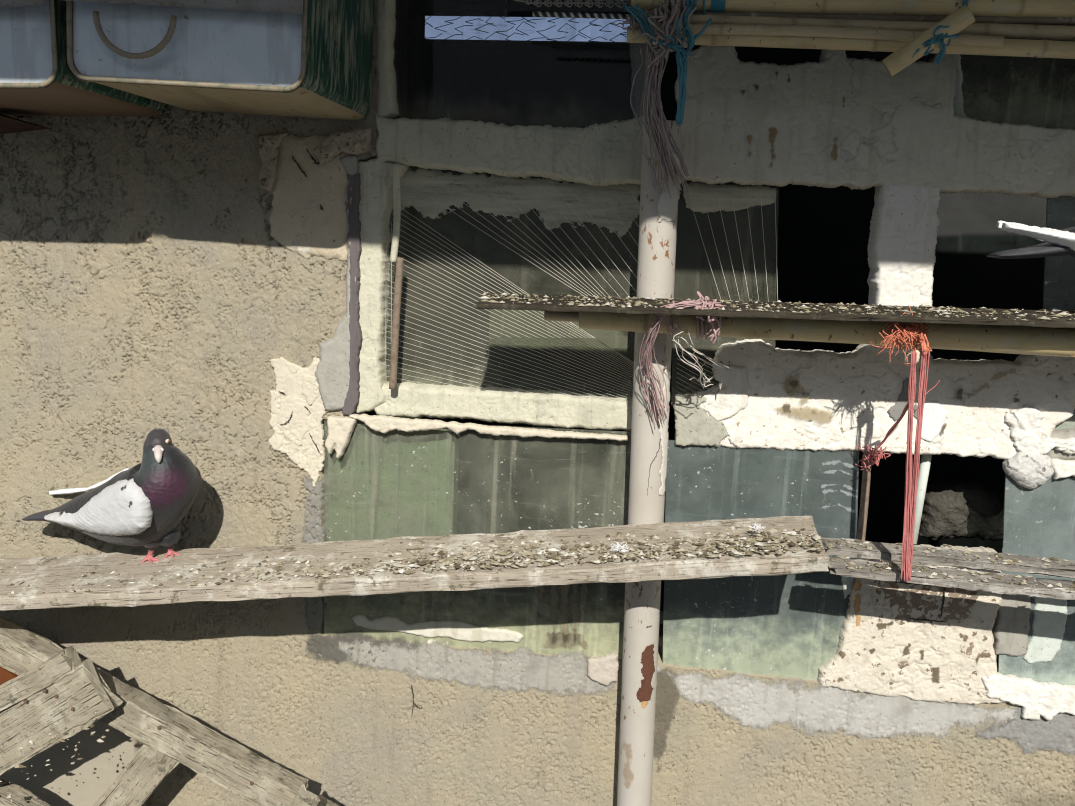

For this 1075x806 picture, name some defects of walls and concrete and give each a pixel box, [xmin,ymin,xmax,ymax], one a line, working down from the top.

flaking render [268,357,628,487]
flaking render [658,346,751,495]
corrosion [637,644,655,708]
water stain [903,646,940,683]